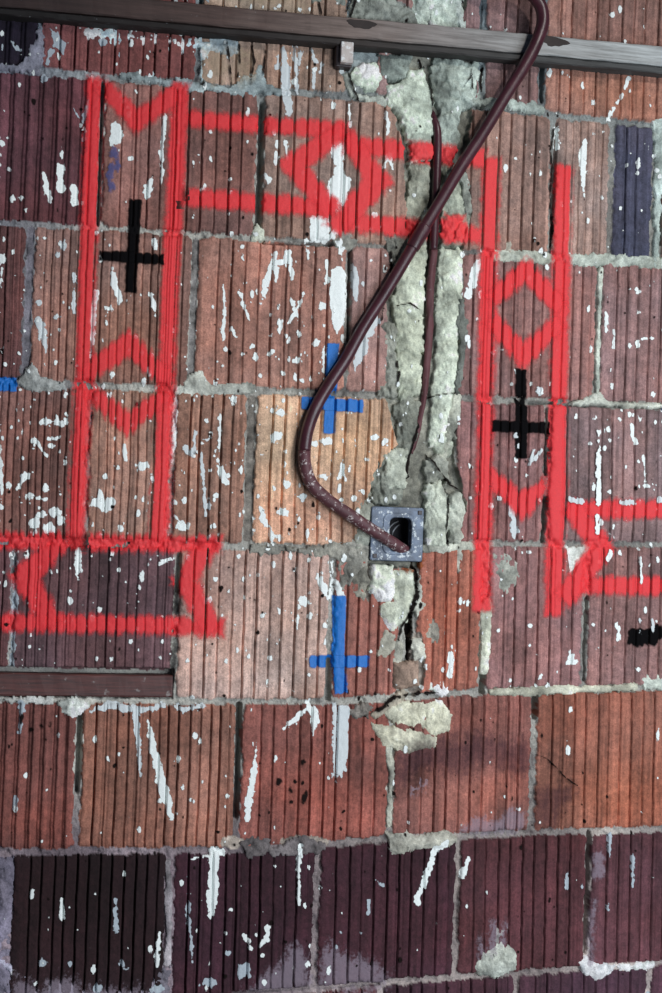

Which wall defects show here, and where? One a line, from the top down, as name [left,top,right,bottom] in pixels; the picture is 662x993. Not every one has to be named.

crack [398,568,420,661]
crack [364,691,438,717]